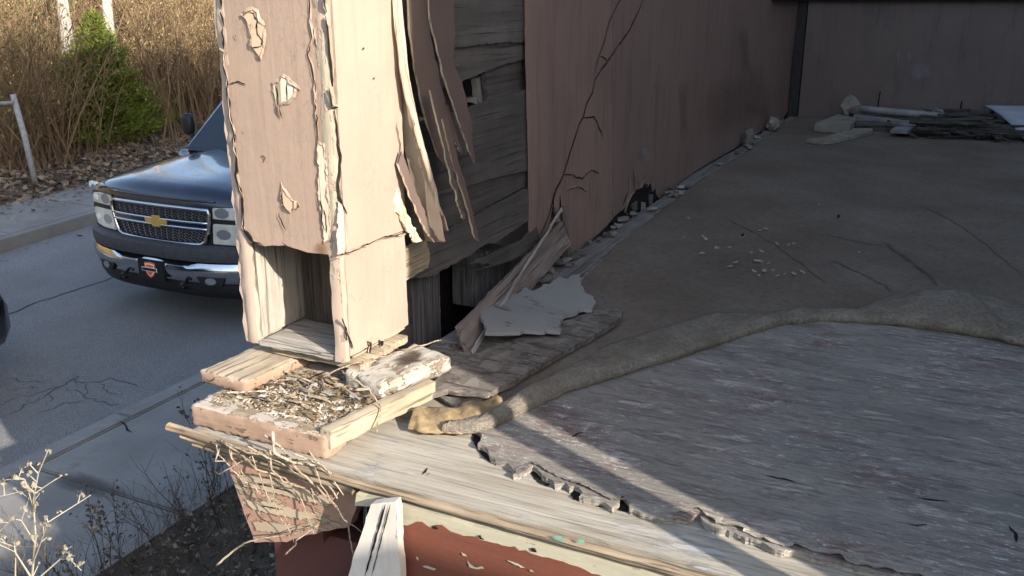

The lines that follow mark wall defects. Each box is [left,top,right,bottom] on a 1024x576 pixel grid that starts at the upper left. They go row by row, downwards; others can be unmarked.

peeling [240,6,267,60]
peeling [271,74,301,118]
crack [536,0,644,244]
peeling [278,183,297,229]
peeling [316,141,348,255]
peeling [606,178,690,237]
crack [337,232,407,258]
hole [439,265,475,338]